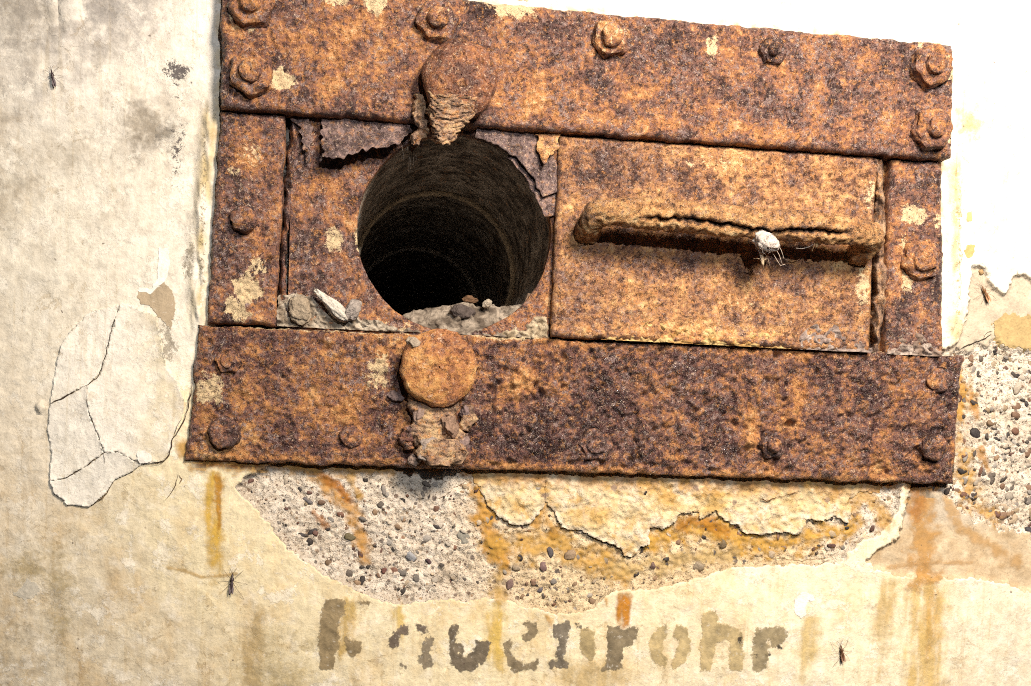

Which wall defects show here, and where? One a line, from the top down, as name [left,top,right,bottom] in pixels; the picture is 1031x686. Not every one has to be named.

rust [277,93,431,317]
rust [474,115,561,217]
rust [870,159,887,352]
peeling [47,248,184,507]
crack [51,309,192,506]
rust [178,404,479,566]
rust [471,485,636,599]
rust [617,595,631,626]
spalling [235,211,1031,618]
rust [644,494,890,573]
rust [876,482,1001,686]
rust [957,374,978,421]